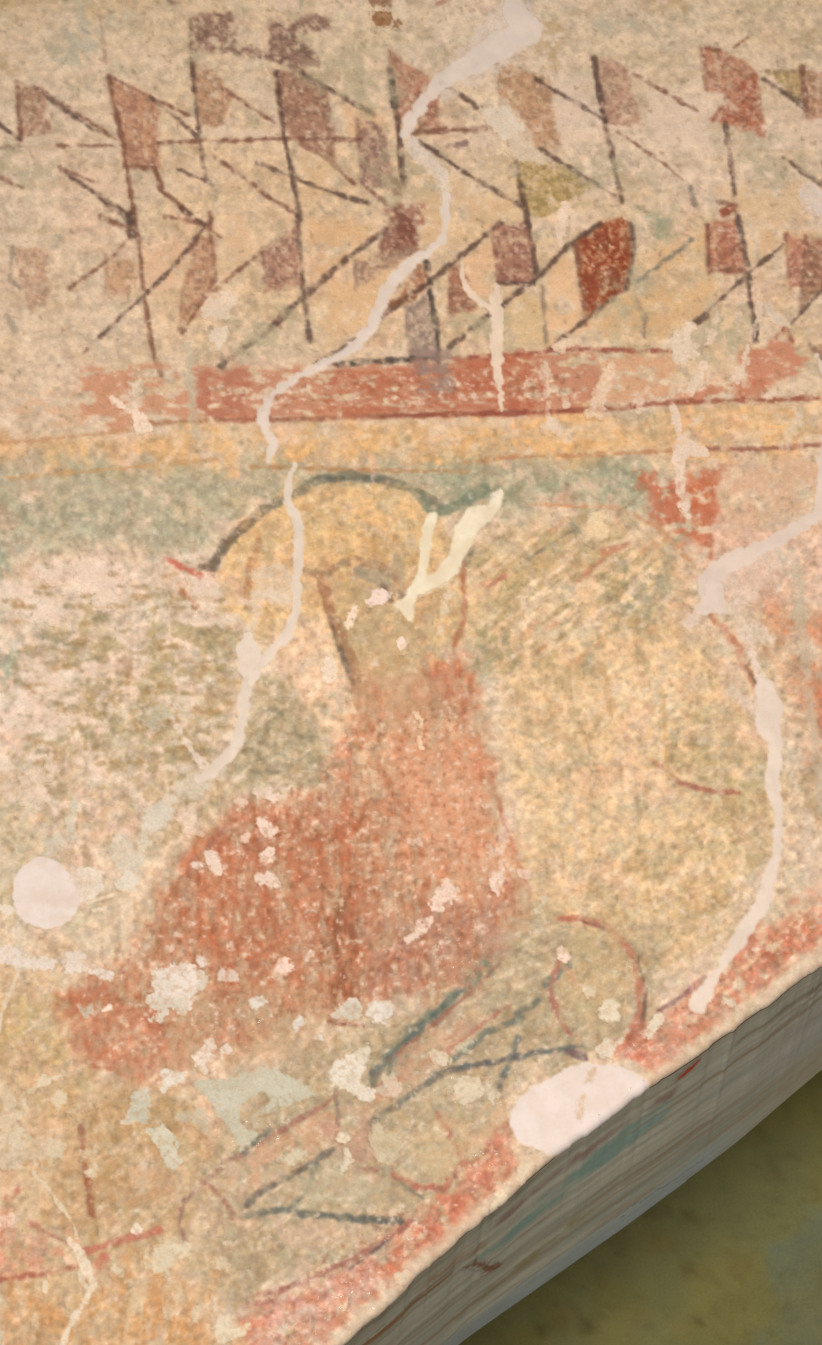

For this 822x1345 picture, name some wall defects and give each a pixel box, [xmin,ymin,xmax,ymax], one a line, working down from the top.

crack [553,200,572,248]
crack [812,351,822,376]
crack [116,0,565,896]
crack [668,403,712,521]
crack [679,408,822,1016]
peeling [402,876,462,950]
flaking render [144,951,241,1025]
peeling [273,948,317,977]
flaking render [329,996,396,1026]
flaking render [118,1034,318,1175]
flaking render [325,1041,404,1176]
flaking render [426,1034,504,1106]